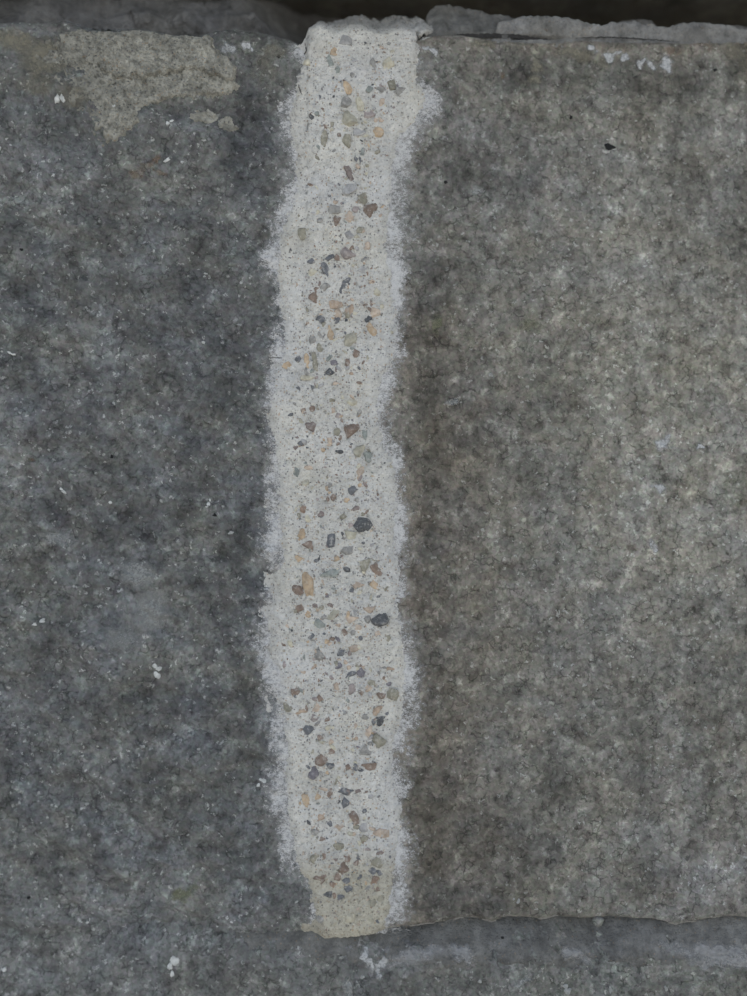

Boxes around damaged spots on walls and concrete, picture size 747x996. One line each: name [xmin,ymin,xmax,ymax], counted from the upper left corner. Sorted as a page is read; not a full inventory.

peeling [34,28,240,147]
damp [255,47,306,572]
damp [375,50,442,805]
damp [249,587,309,883]
damp [376,819,419,934]